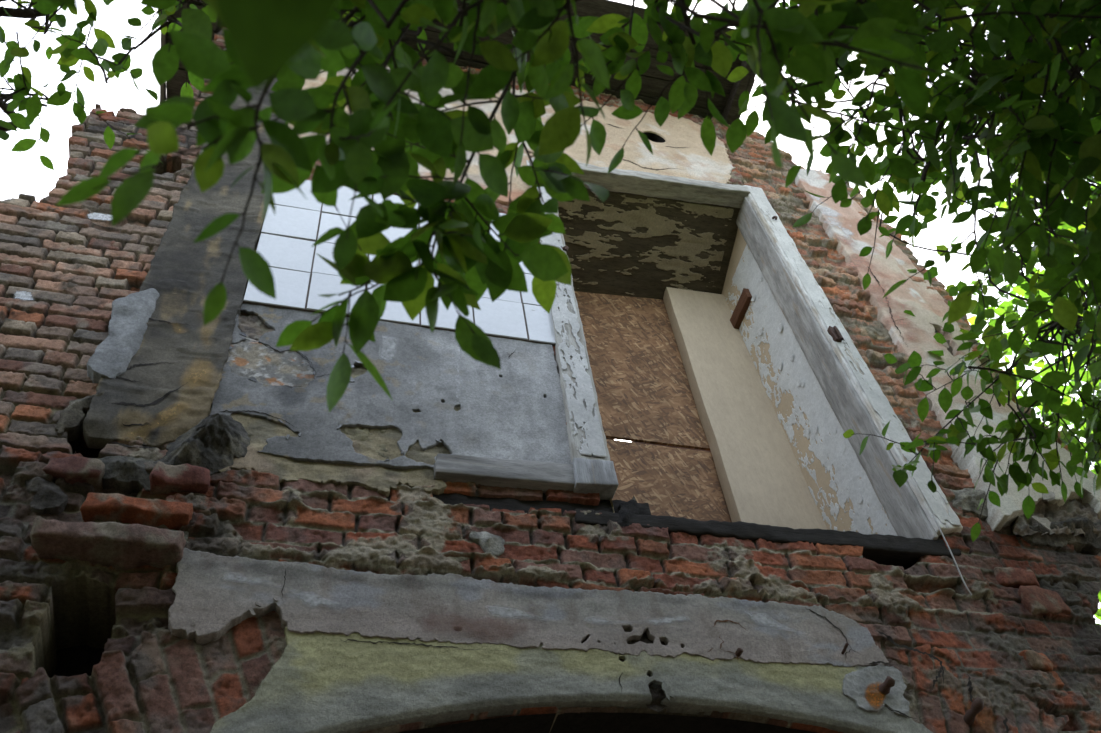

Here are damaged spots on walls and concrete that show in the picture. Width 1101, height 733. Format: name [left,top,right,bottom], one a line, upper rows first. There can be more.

spalling [77,448,102,458]
crack [111,362,188,449]
peeling [227,309,316,388]
spalling [350,360,367,383]
spalling [337,424,404,462]
spalling [434,439,451,465]
peeling [531,186,734,457]
peeling [726,186,961,536]
spalling [135,596,286,733]
crack [341,639,507,652]
corrosion [866,683,885,709]
crack [805,607,1009,733]